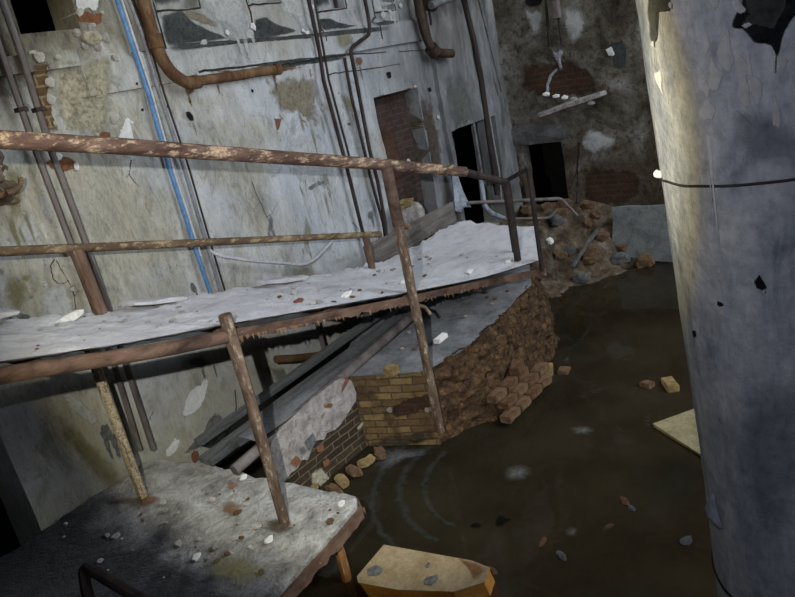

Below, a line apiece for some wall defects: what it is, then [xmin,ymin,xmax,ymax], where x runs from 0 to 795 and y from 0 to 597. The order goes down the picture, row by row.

spalling [62,0,104,27]
spalling [29,50,58,133]
spalling [524,58,607,98]
peeling [96,117,134,139]
flaking render [382,101,441,164]
spalling [0,151,21,206]
spalling [585,166,639,207]
peeling [20,212,40,245]
flaking render [270,377,356,482]